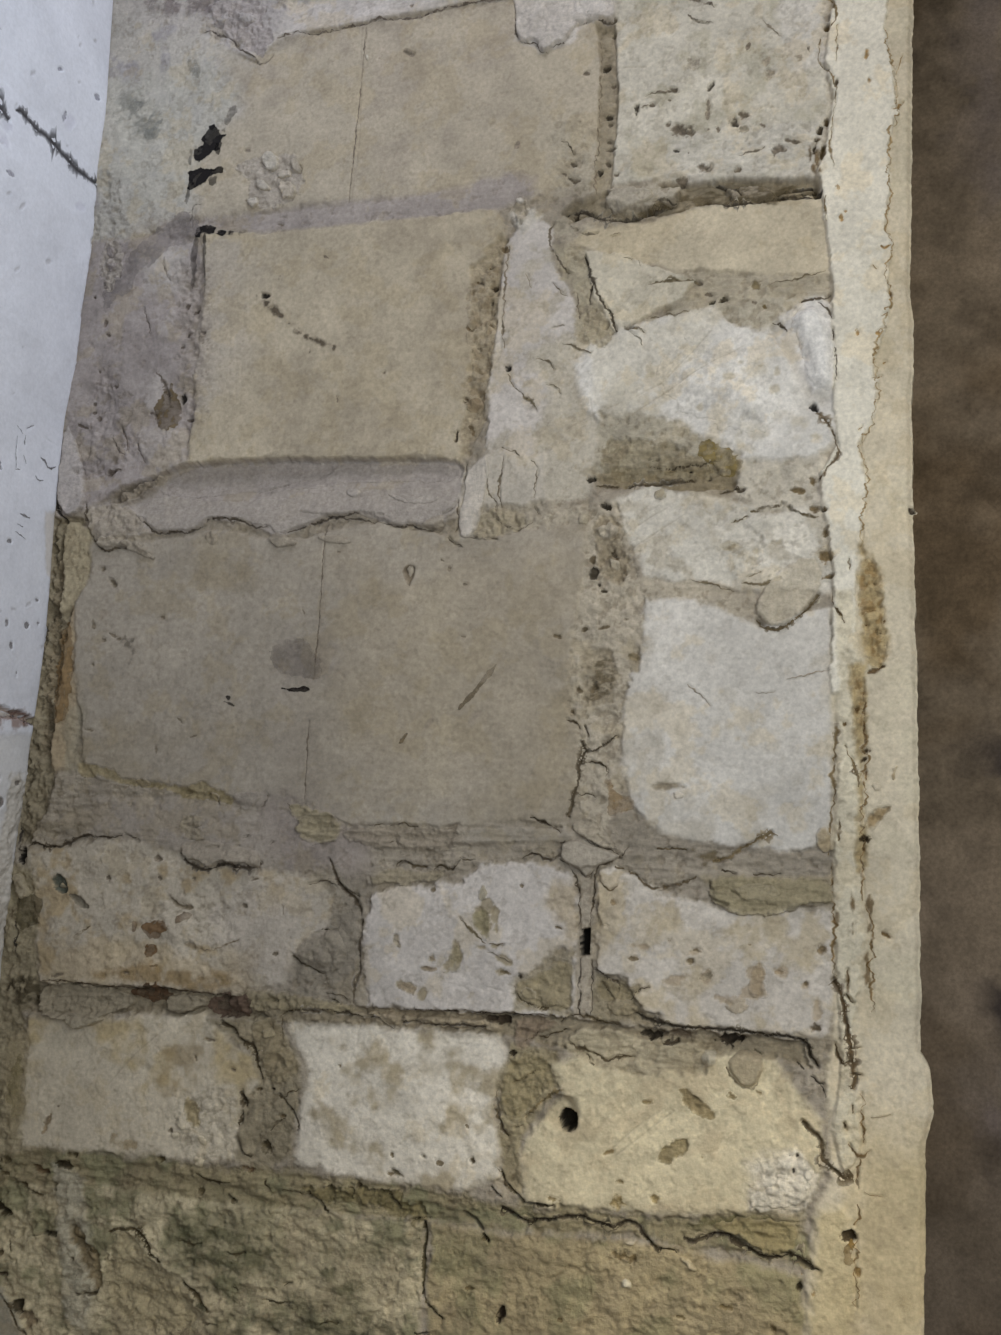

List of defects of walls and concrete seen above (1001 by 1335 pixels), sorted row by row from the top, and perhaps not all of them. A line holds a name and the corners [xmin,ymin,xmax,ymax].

flaking render [513,0,618,53]
crack [205,0,700,409]
crack [756,669,830,694]
crack [42,692,891,1335]
crack [0,1243,27,1335]